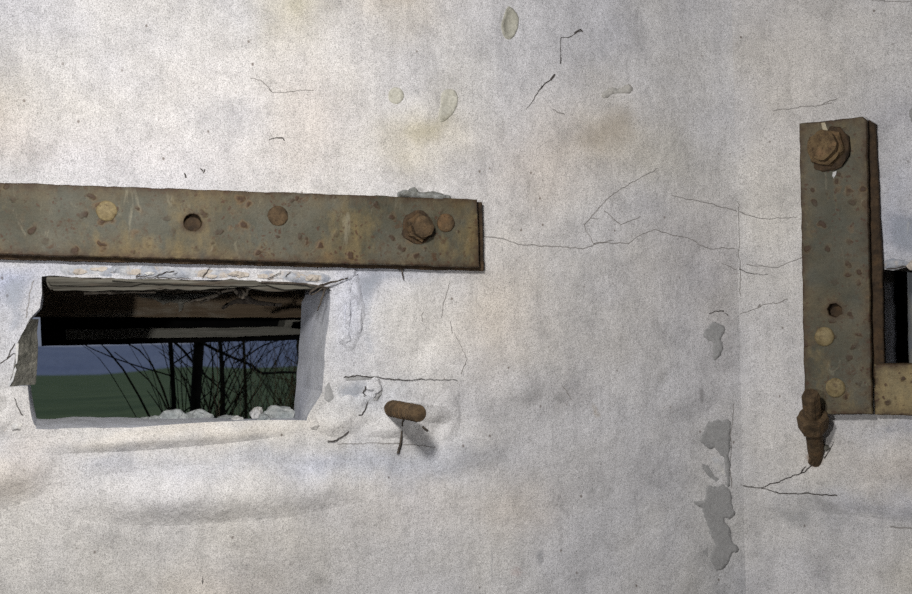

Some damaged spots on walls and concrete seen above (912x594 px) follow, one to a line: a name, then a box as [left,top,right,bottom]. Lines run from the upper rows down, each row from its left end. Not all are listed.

crack [483,168,802,316]
spalling [884,258,912,270]
peeling [703,322,725,360]
peeling [694,419,739,570]
crack [730,404,837,496]